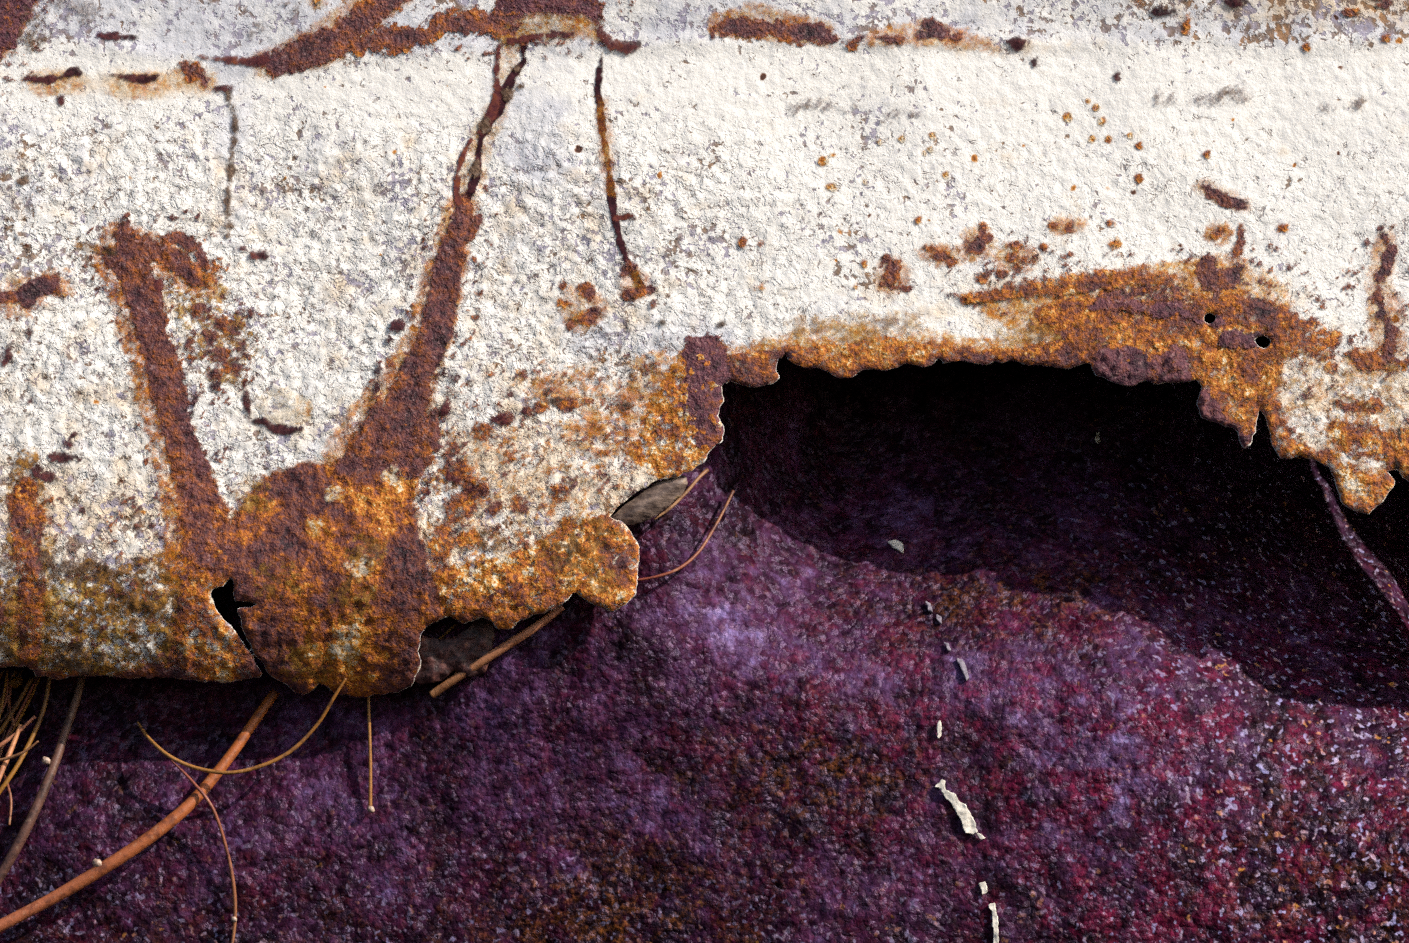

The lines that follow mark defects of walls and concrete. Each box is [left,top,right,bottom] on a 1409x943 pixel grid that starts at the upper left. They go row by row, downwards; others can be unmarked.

rust [0,0,115,96]
rust [198,0,641,80]
rust [792,97,858,115]
rust [877,109,921,145]
rust [1086,99,1143,150]
rust [1154,80,1253,107]
crack [594,57,657,308]
rust [818,153,836,166]
rust [0,174,1409,697]